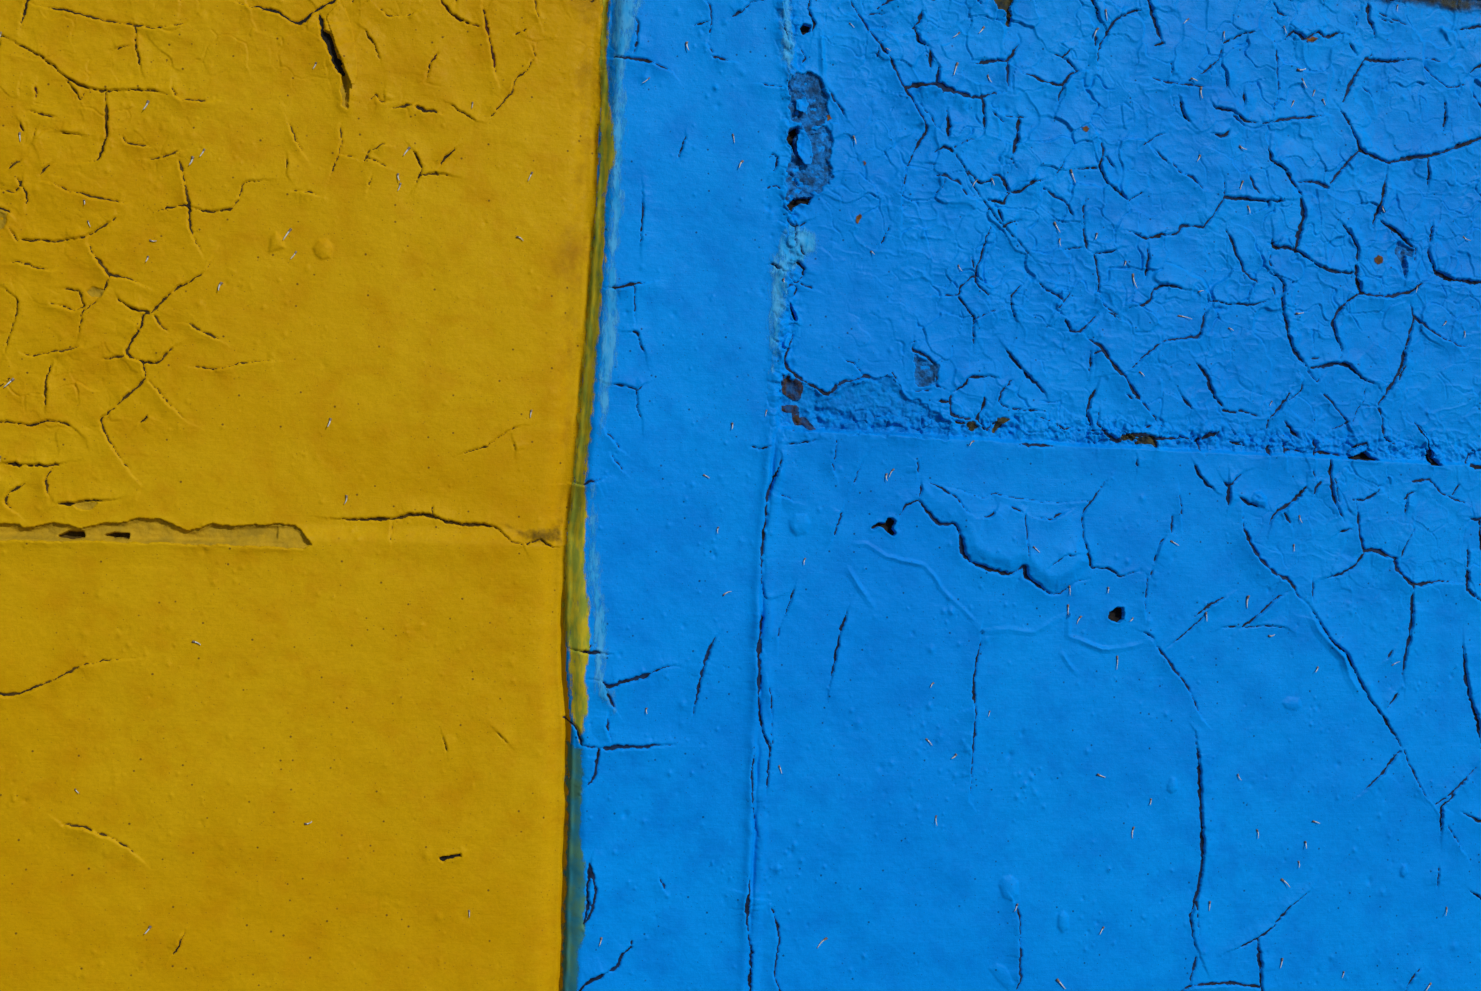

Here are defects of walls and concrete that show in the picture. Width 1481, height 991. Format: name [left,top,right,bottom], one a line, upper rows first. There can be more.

crack [694,0,816,87]
peeling [785,72,834,201]
crack [0,0,539,468]
crack [767,154,812,295]
crack [5,462,102,508]
peeling [0,501,311,549]
crack [336,507,554,548]
crack [750,440,859,818]
crack [563,637,716,785]
crack [583,863,597,925]
crack [579,940,632,991]
crack [744,880,781,991]